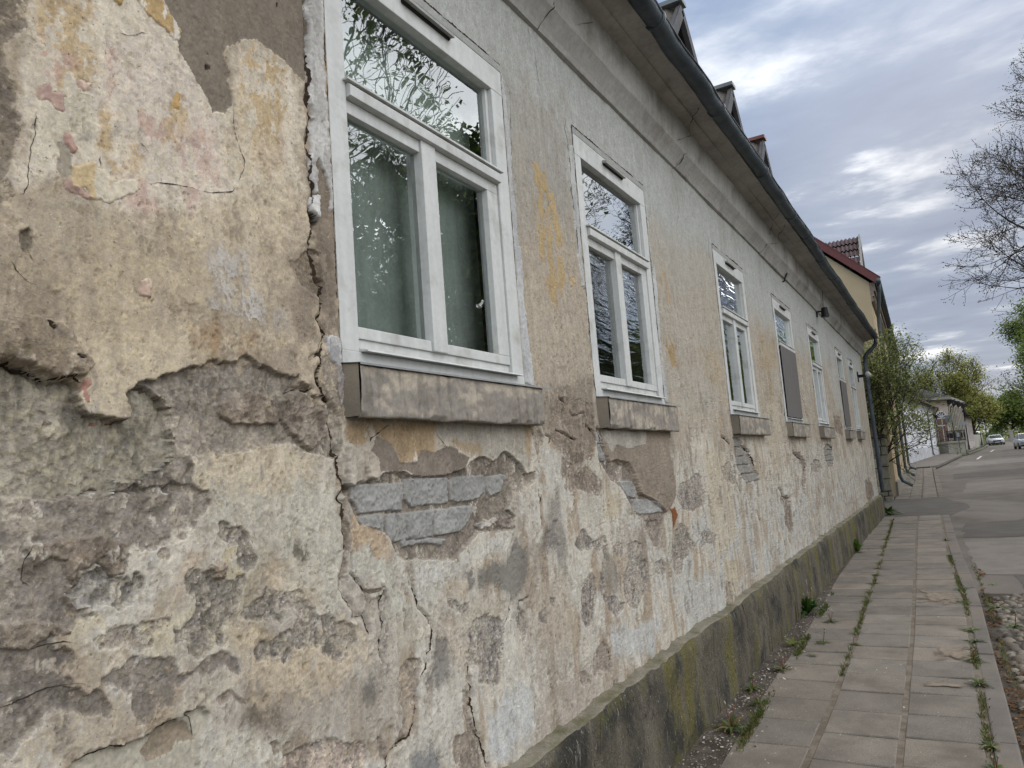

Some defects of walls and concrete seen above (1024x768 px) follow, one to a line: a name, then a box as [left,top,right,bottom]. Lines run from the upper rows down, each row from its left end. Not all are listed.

peeling [137,0,308,114]
crack [23,117,37,194]
crack [157,117,245,193]
crack [284,6,384,651]
flaking render [720,436,760,486]
spalling [792,413,843,491]
spalling [0,349,716,768]
crack [0,683,86,708]
crack [467,650,487,768]